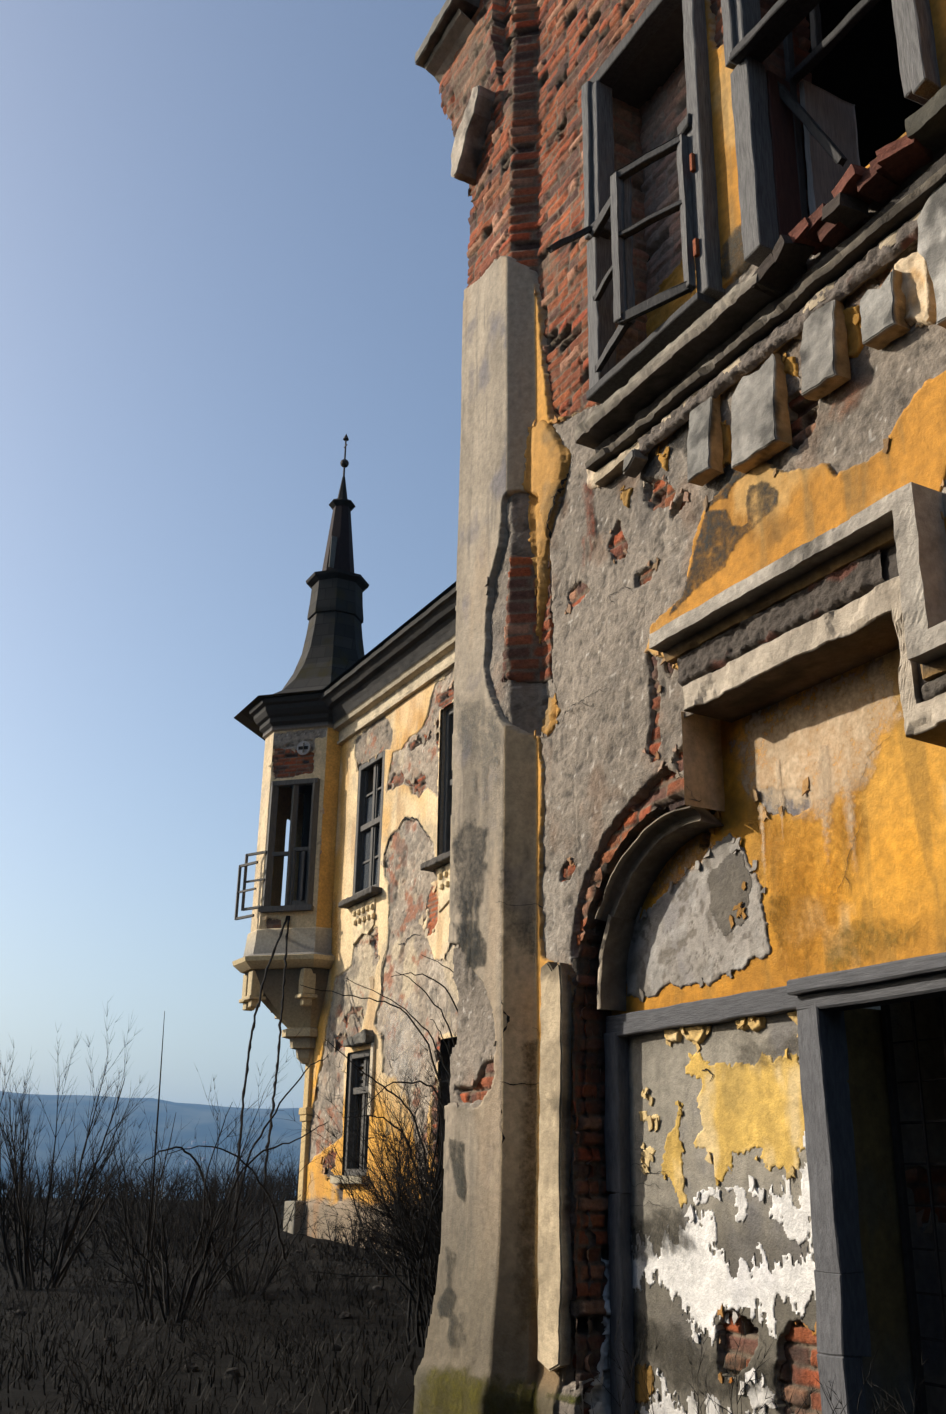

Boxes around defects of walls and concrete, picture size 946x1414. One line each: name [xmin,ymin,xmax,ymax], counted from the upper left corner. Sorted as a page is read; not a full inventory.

flaking render [269,728,328,779]
flaking render [438,0,946,1414]
water stain [452,824,502,986]
flaking render [307,817,496,1201]
water stain [448,1140,465,1202]